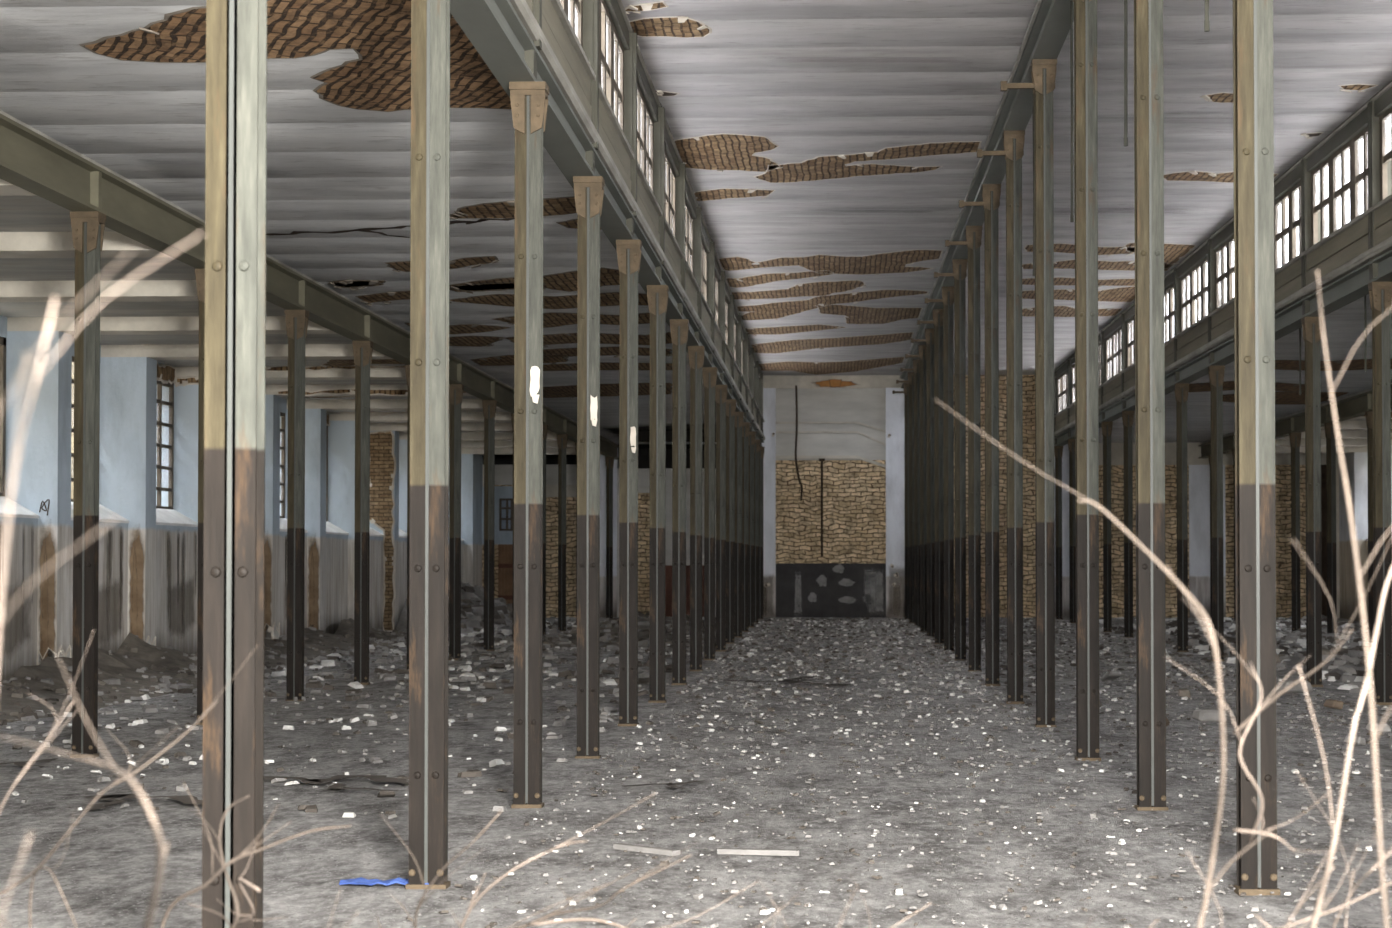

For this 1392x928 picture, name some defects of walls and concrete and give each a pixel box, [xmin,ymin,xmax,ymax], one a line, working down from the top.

flaking render [79,6,206,63]
flaking render [267,0,411,112]
flaking render [450,13,511,110]
flaking render [625,1,712,38]
flaking render [543,196,577,229]
flaking render [674,133,982,201]
flaking render [449,256,514,366]
flaking render [530,267,620,427]
flaking render [719,249,943,375]
leakage [0,529,56,664]
leakage [98,532,144,642]
leakage [167,536,197,633]